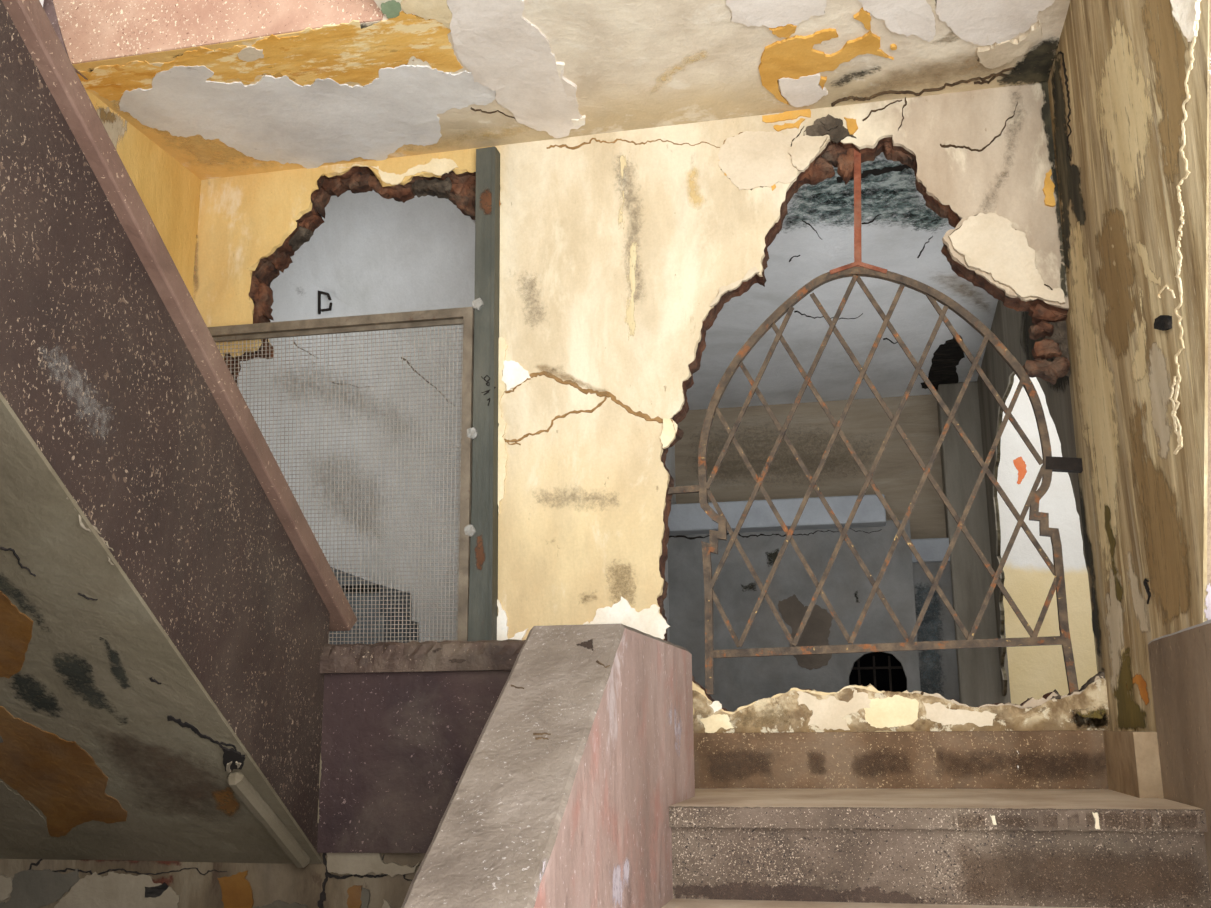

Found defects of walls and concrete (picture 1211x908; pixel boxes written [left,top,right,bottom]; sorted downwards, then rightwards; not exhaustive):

crack [831,67,1018,152]
peeling [78,0,585,320]
crack [546,138,720,150]
crack [836,164,912,183]
spalling [692,0,1201,733]
crack [504,371,673,446]
leakage [11,673,61,717]
leakage [53,653,127,723]
leakage [99,637,130,689]
leakage [939,751,1104,777]
peeling [54,871,180,908]
peeling [326,853,421,908]